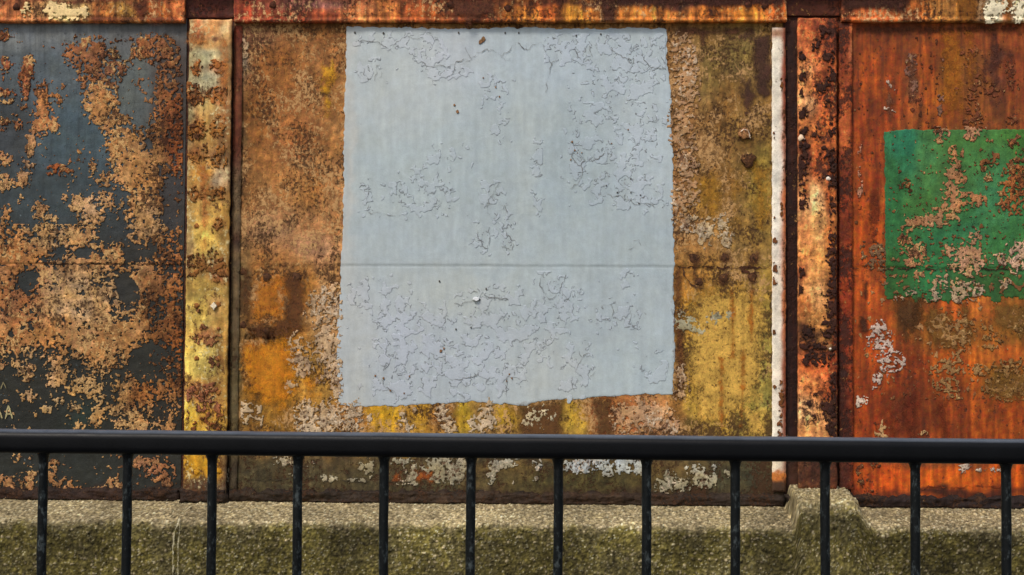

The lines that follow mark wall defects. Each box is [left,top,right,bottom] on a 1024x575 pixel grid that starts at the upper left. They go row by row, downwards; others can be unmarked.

rust [843,0,909,14]
peeling [0,32,183,430]
rust [186,382,224,431]
rust [189,309,222,368]
rust [186,40,229,284]
rust [239,268,308,341]
peeling [284,281,421,433]
peeling [390,457,466,486]
crack [347,239,641,401]
crack [355,31,666,256]
peeling [563,459,642,477]
peeling [854,36,1024,438]